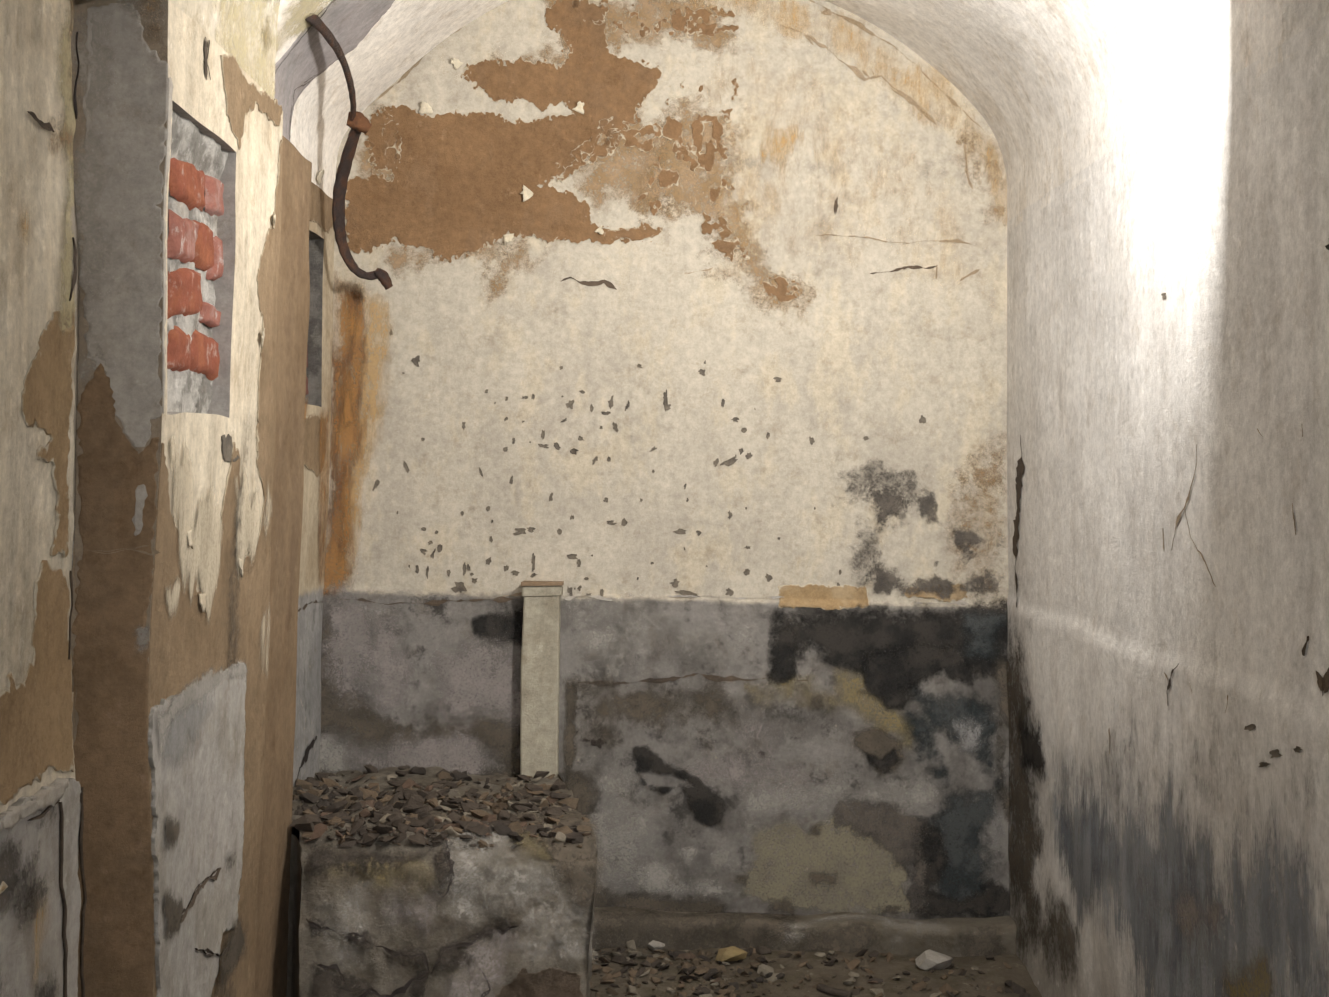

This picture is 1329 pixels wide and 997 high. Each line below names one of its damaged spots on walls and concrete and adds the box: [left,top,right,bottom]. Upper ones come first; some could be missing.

spalling [310,0,816,310]
rust [304,280,388,595]
spalling [503,430,583,455]
spalling [561,390,630,432]
spalling [713,399,753,467]
spalling [0,54,283,997]
spalling [447,562,478,593]
spalling [486,506,537,578]
damp [428,451,1329,997]
damp [307,842,434,957]
crack [434,840,455,897]
crack [306,919,519,997]